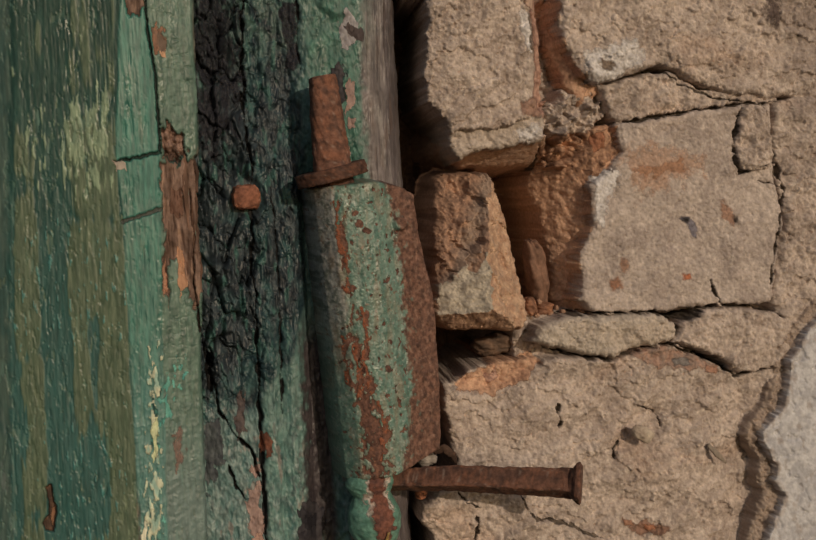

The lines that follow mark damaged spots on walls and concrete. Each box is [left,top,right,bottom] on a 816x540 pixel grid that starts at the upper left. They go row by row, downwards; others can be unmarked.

peeling [125,0,145,17]
peeling [339,7,364,50]
crack [112,151,161,172]
crack [609,65,785,283]
crack [121,207,162,224]
peeling [159,120,203,310]
corrosion [333,186,409,540]
spalling [439,331,541,397]
peeling [140,340,189,540]
peeling [43,484,57,531]